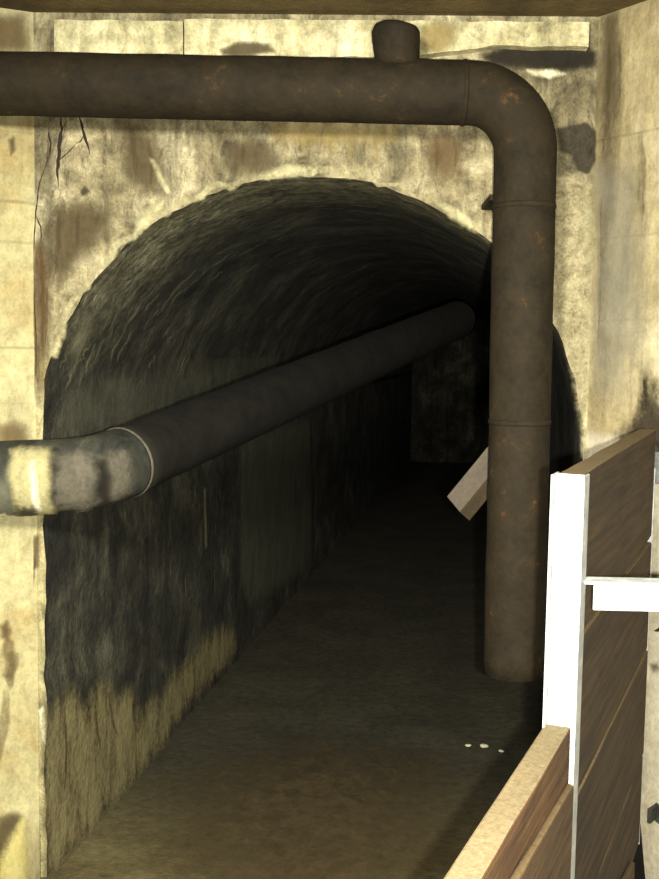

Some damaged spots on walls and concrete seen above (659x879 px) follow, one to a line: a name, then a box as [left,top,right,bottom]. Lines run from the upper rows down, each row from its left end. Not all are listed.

leakage [222,43,273,55]
crack [34,117,90,245]
crack [31,278,39,373]